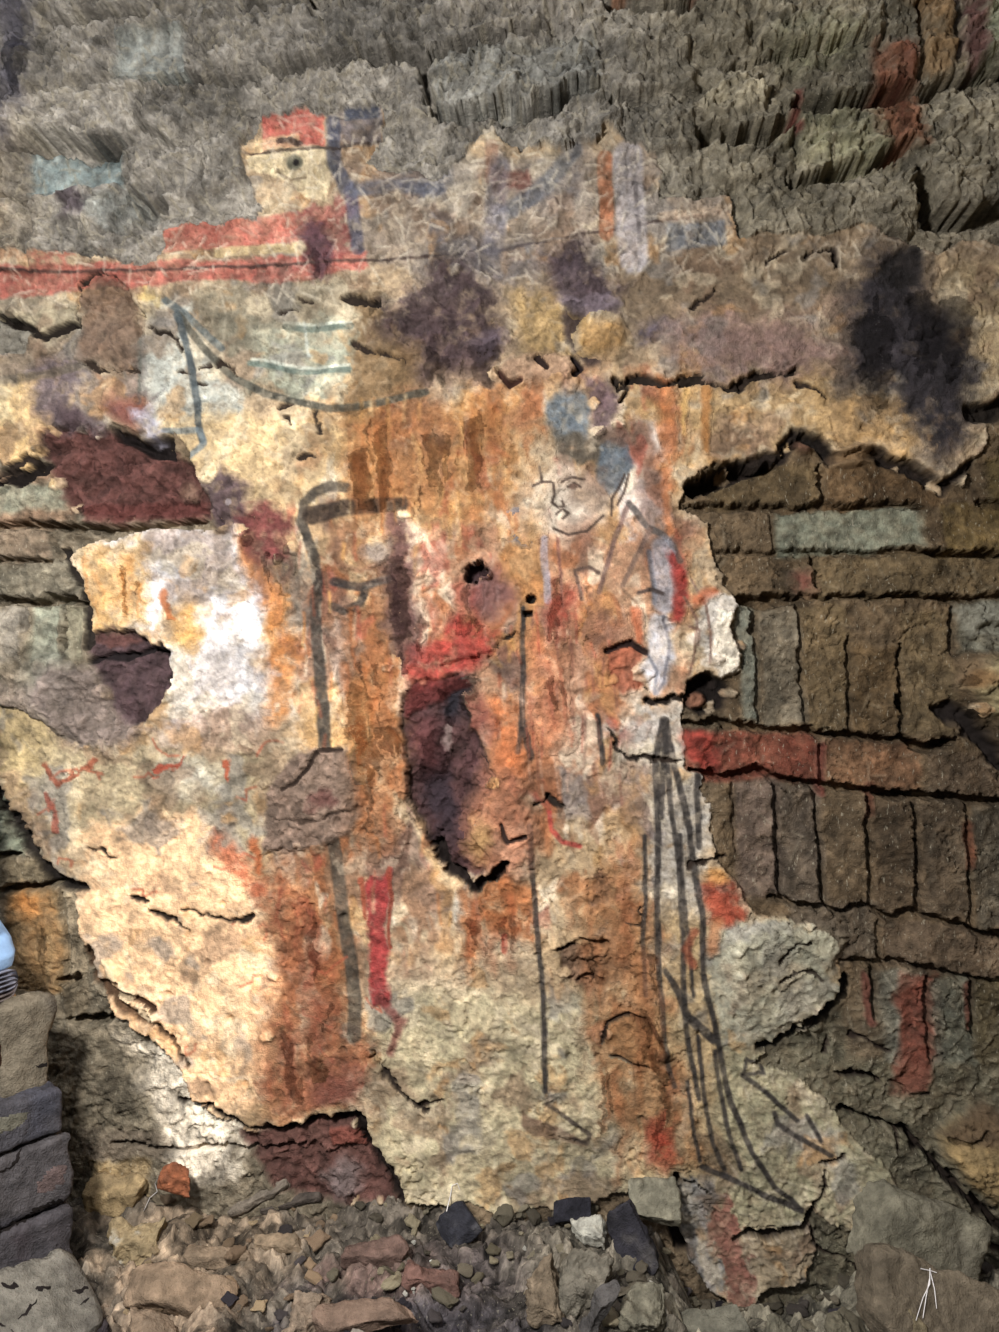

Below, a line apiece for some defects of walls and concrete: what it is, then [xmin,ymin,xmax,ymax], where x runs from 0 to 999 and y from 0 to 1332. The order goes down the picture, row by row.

flaking render [0,380,222,532]
damp [343,248,519,414]
crack [611,366,828,404]
damp [534,228,980,452]
flaking render [682,425,977,500]
flaking render [61,546,175,736]
flaking render [682,606,748,718]
flaking render [0,786,91,894]
flaking render [401,675,500,884]
crack [128,894,256,933]
flaking render [722,911,851,1053]
flaking render [237,1109,407,1208]